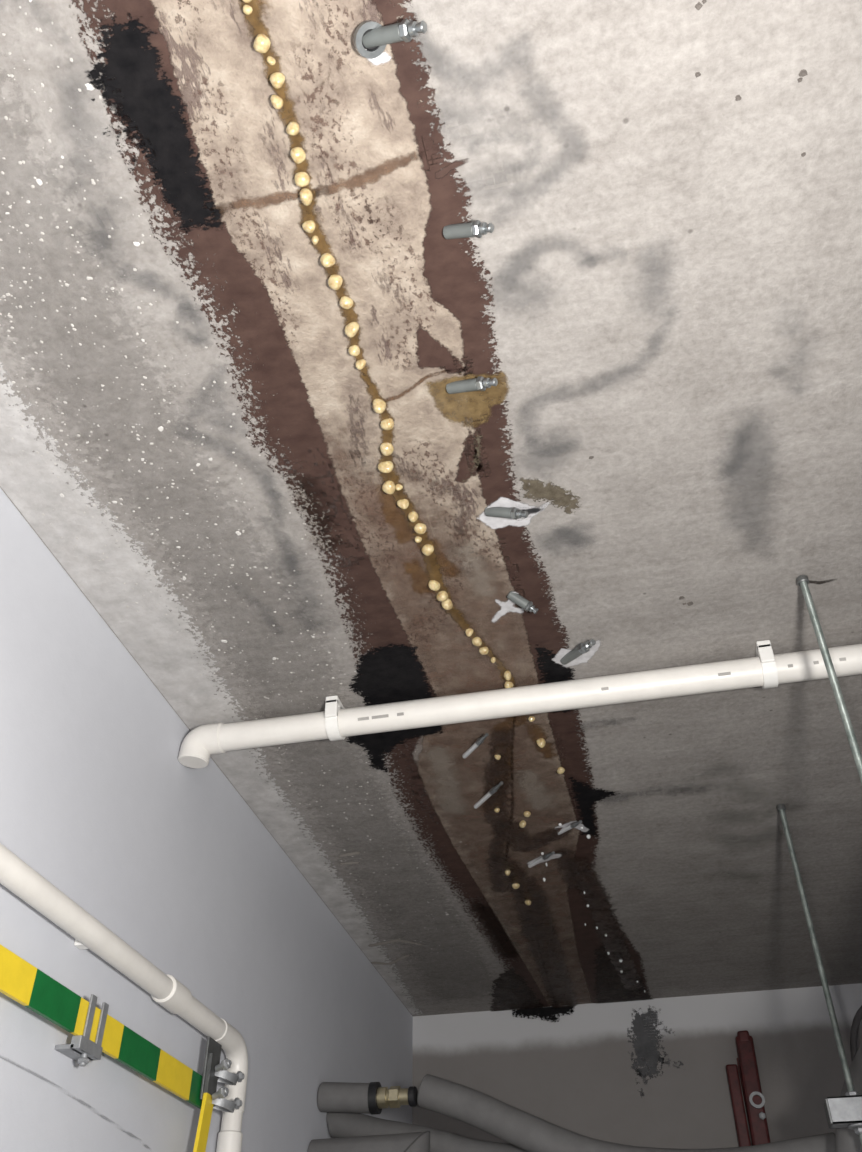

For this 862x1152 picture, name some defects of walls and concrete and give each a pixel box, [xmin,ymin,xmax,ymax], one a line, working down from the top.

corrosion [202,152,419,215]
peeling [0,155,357,731]
spalling [150,0,539,697]
crack [239,0,516,688]
corrosion [427,371,509,481]
corrosion [520,477,580,514]
peeling [210,745,424,1016]
spalling [415,712,597,1007]
crack [483,715,565,960]
damp [485,730,645,1008]
damp [627,1005,684,1097]